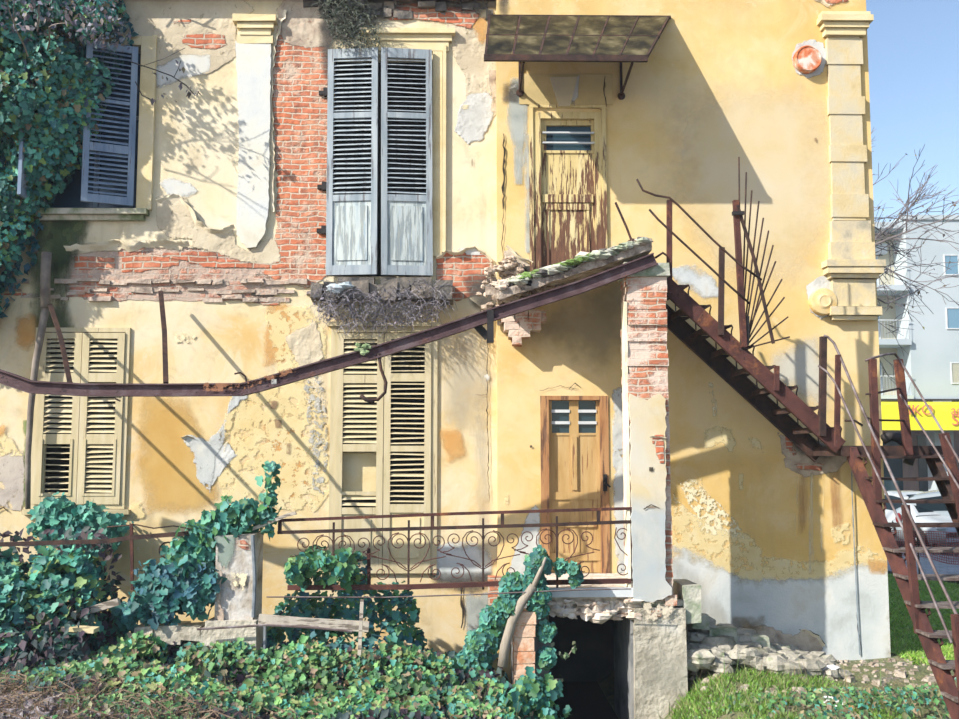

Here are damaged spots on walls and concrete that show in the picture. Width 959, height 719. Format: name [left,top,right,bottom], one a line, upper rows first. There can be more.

flaking render [388,3,496,144]
flaking render [64,0,333,371]
peeling [0,433,25,511]
peeling [131,376,329,519]
peeling [704,383,736,452]
spalling [778,432,847,477]
flaking render [672,478,891,660]